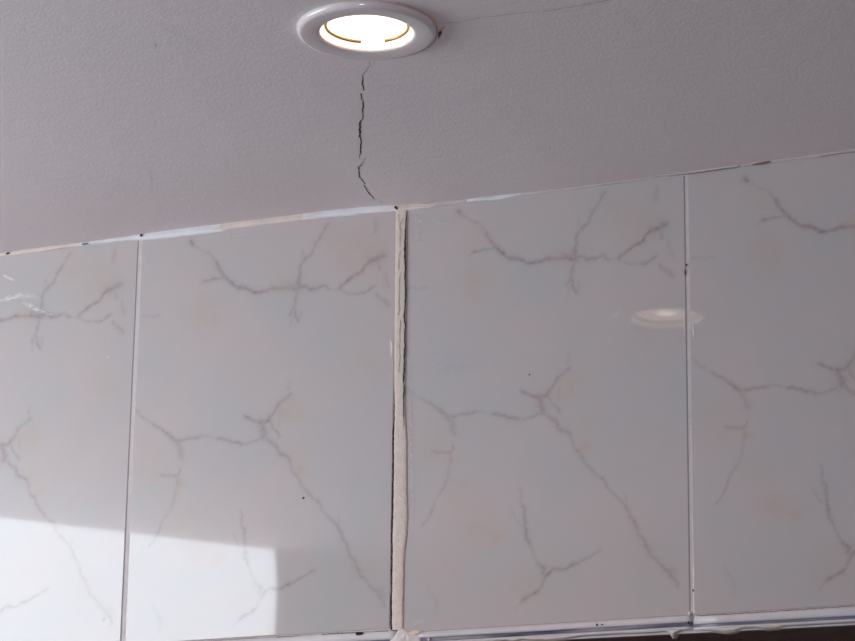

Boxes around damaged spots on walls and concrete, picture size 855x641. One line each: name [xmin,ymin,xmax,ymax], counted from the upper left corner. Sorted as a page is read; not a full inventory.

crack [358,65,382,202]